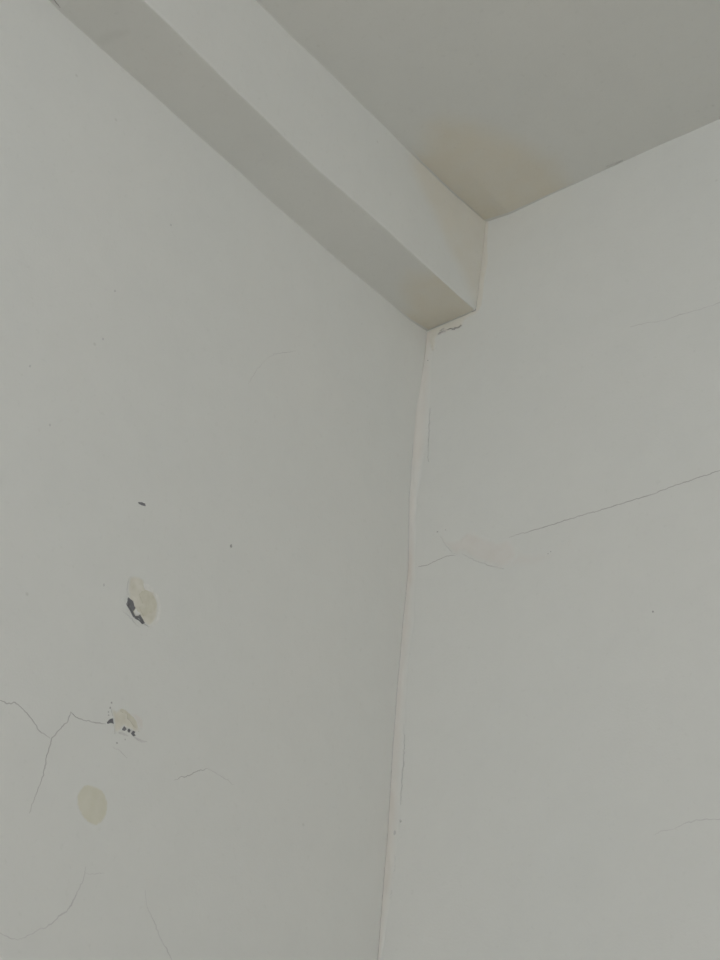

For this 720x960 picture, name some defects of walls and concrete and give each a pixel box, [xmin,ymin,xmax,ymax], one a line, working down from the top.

crack [509,470,720,538]
flaking render [120,576,161,628]
crack [0,700,103,813]
flaking render [107,702,147,758]